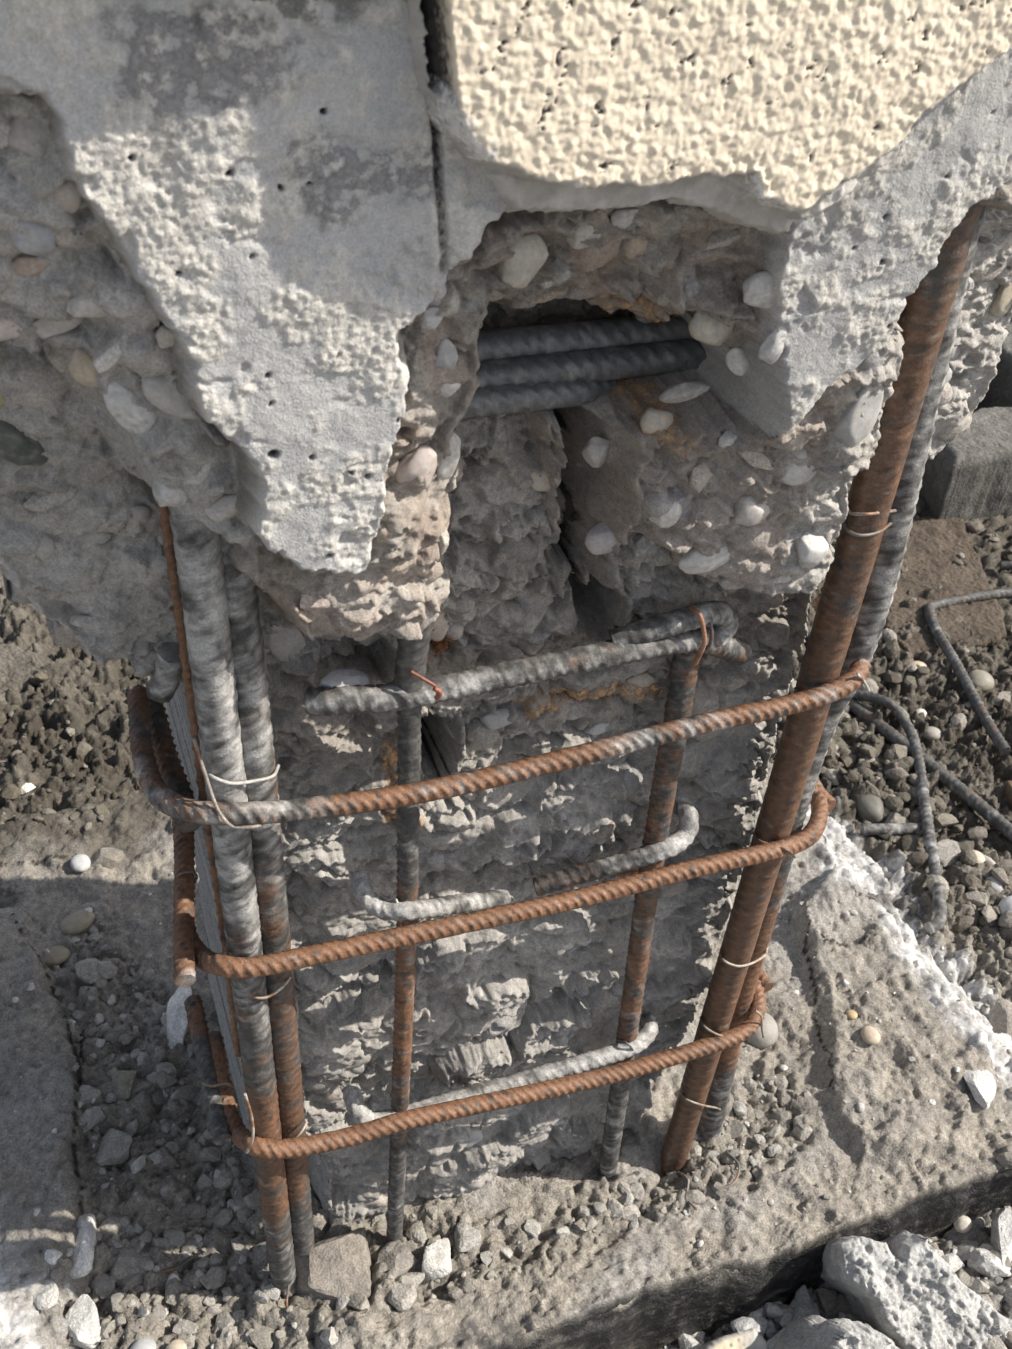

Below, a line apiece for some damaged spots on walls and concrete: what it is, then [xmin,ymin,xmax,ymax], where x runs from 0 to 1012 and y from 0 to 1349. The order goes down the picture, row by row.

spalling [0,92,1012,802]
spalling [203,823,291,957]
rust [381,733,398,787]
spalling [396,804,420,902]
rust [428,629,452,662]
rust [516,682,661,720]
spalling [693,855,794,1042]
spalling [750,690,1012,934]
water stain [814,811,1012,1099]
crack [11,914,85,1214]
spalling [225,970,306,1140]
spalling [660,1043,742,1175]